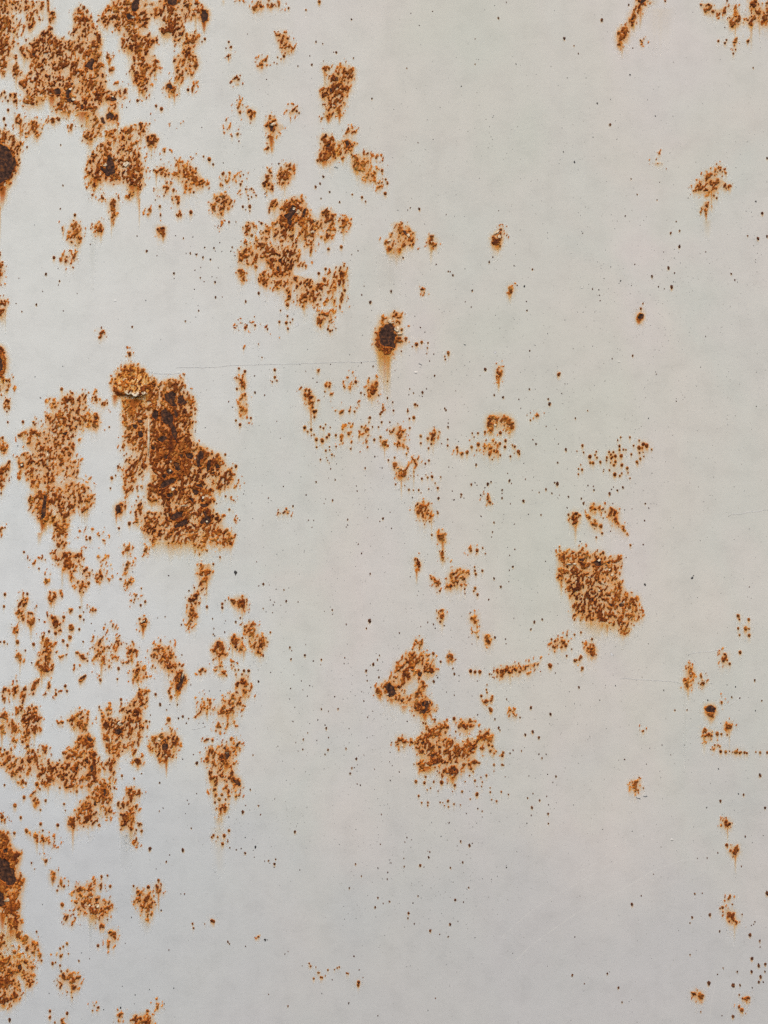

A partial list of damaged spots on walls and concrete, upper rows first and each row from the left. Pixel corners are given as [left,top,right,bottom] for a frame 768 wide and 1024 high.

corrosion [617,0,666,51]
corrosion [700,0,768,55]
corrosion [0,0,389,358]
corrosion [690,161,732,218]
corrosion [299,310,653,814]
corrosion [0,367,276,1024]
corrosion [680,660,709,691]
corrosion [701,693,768,754]